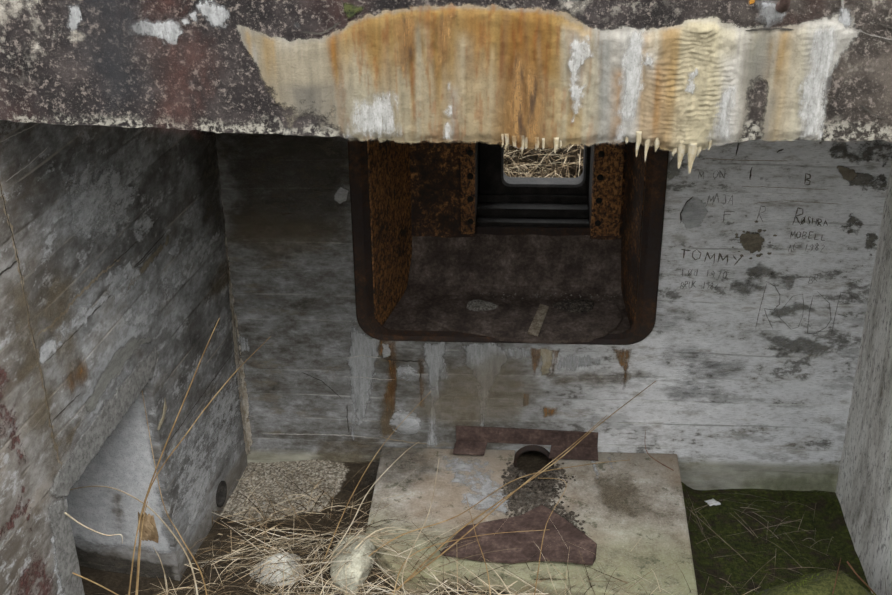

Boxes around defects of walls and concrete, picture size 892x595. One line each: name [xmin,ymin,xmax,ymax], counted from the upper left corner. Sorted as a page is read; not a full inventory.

leakage [730,264,794,294]
leakage [770,302,814,317]
leakage [318,321,380,463]
corrosion [379,340,397,435]
leakage [423,342,448,445]
efflorescence [462,342,538,427]
corrosion [615,349,631,386]
leakage [767,336,834,356]
leakage [444,456,509,514]